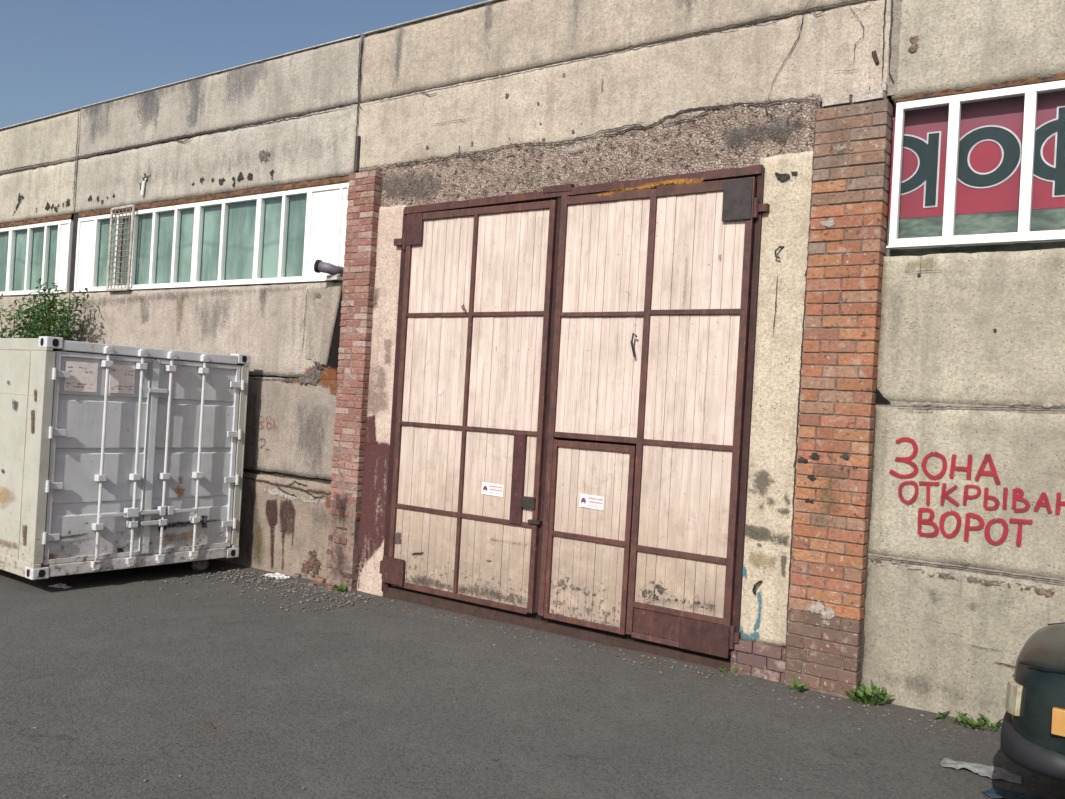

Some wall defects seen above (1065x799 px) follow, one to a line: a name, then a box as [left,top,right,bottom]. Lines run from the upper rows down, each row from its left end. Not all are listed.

spalling [191,171,253,186]
spalling [359,93,821,207]
crack [0,0,894,641]